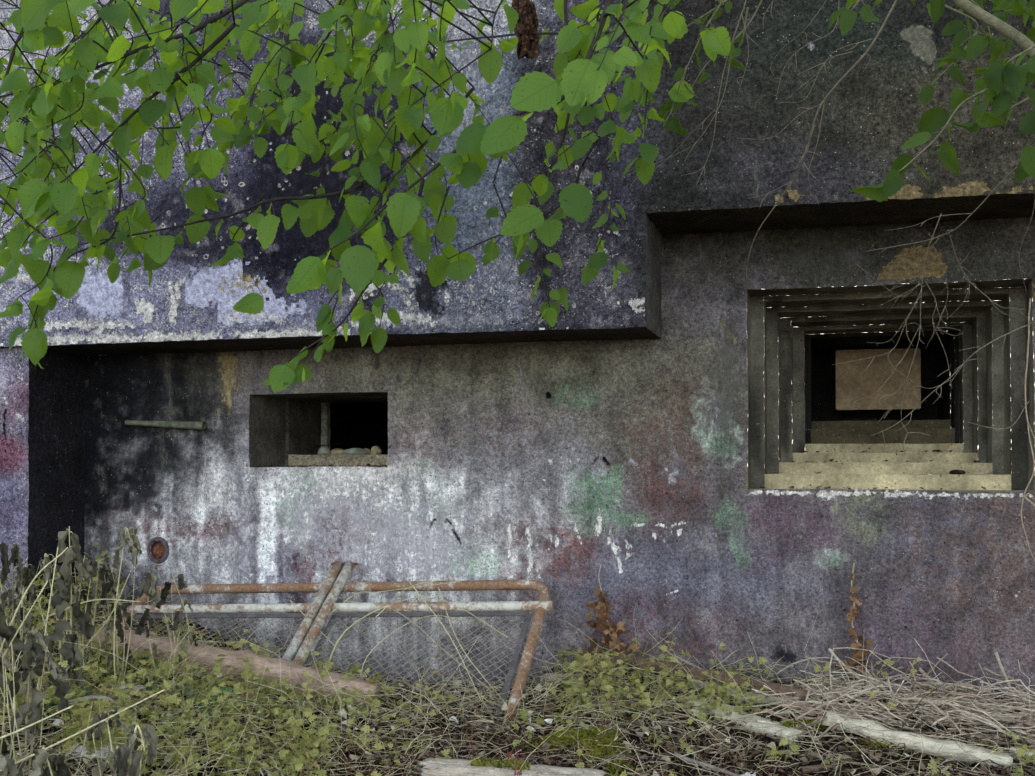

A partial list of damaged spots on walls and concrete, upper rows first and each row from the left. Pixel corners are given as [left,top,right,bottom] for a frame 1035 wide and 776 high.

spalling [888,180,1034,199]
spalling [877,245,948,282]
crack [429,518,461,544]
rust [153,541,164,575]